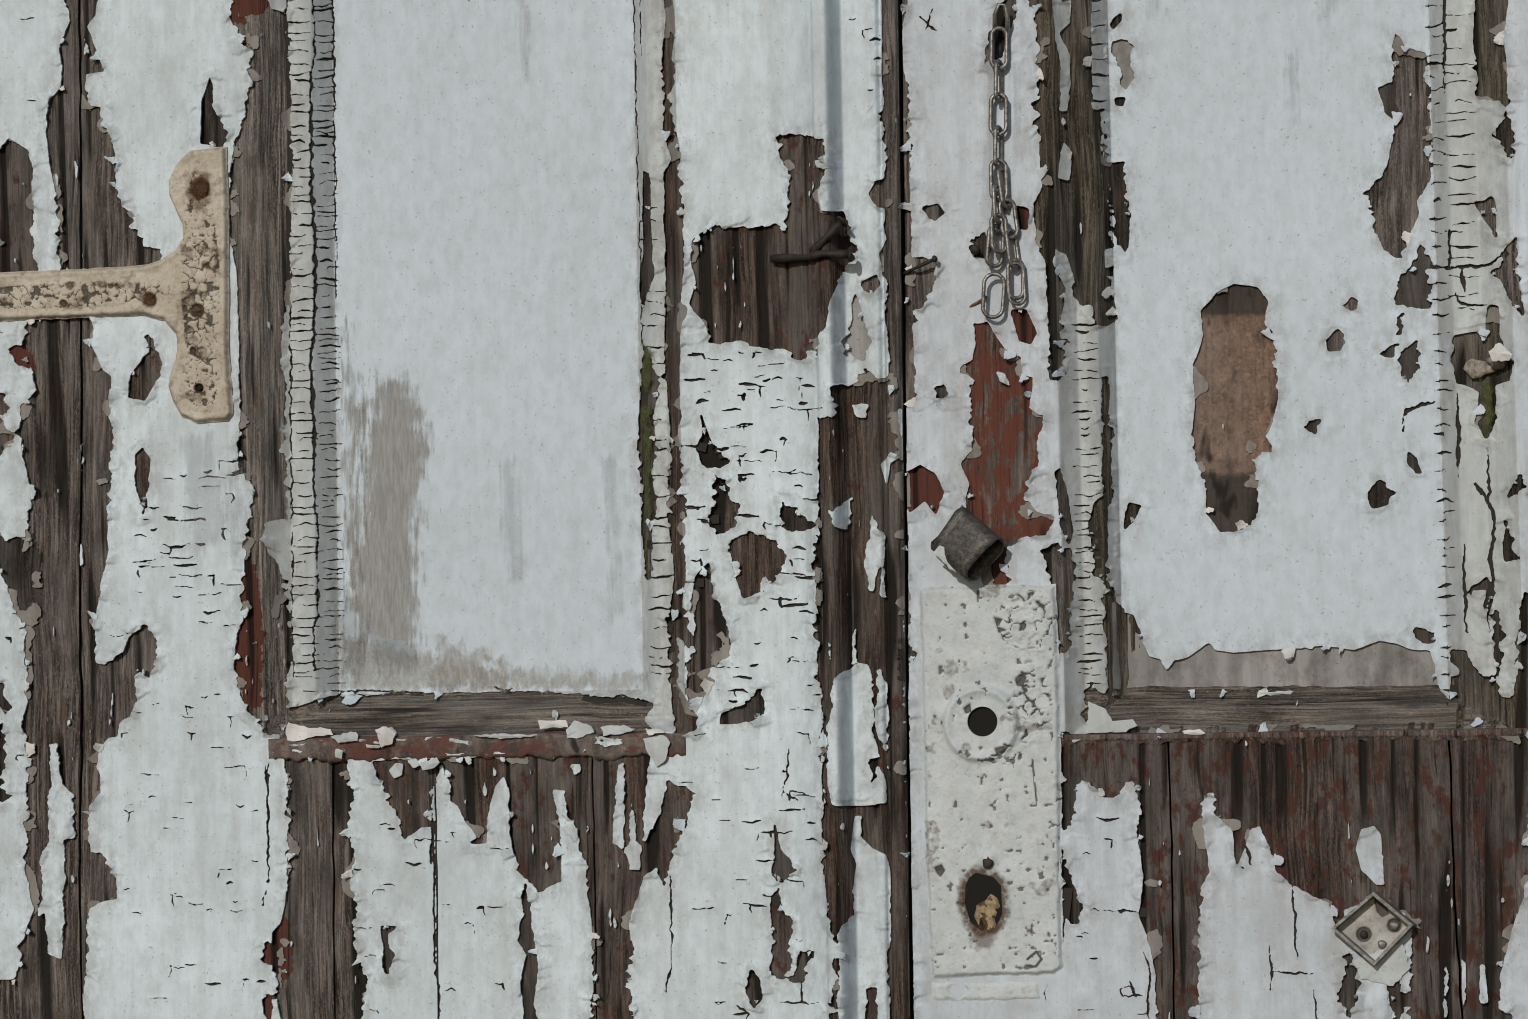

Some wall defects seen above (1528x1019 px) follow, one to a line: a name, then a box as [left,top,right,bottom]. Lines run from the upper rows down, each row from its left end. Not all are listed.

peeling [0,318,157,1019]
peeling [0,0,162,272]
crack [134,456,246,626]
crack [283,0,424,699]
damp [344,376,429,657]
peeling [201,0,653,739]
crack [355,769,501,1019]
peeling [373,749,696,1019]
crack [582,0,824,992]
peeling [637,0,945,1019]
peeling [960,0,1528,1019]
crack [1402,0,1509,694]